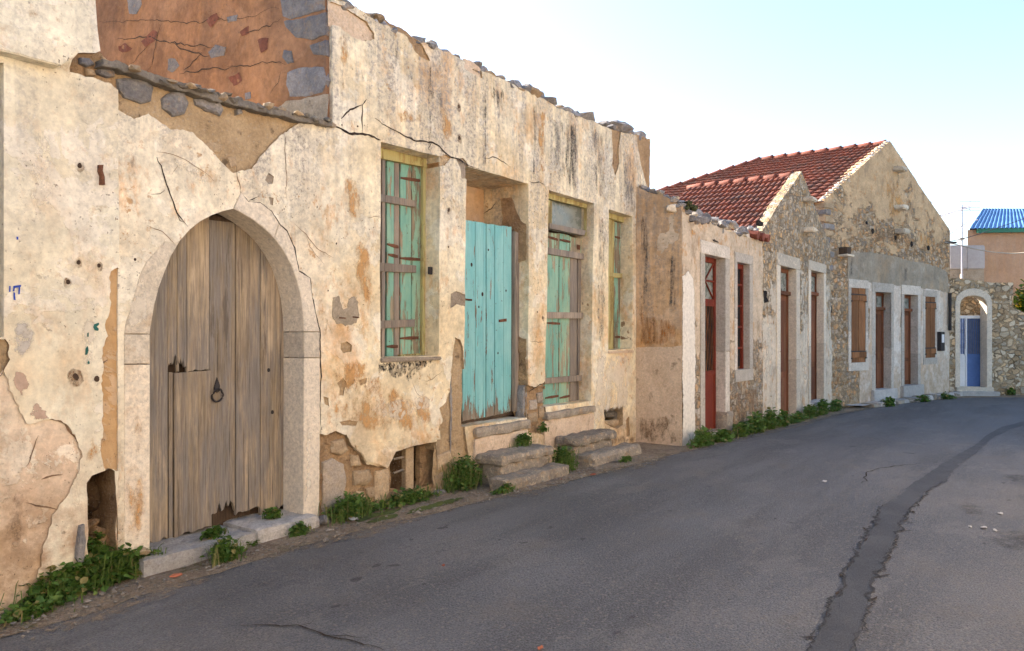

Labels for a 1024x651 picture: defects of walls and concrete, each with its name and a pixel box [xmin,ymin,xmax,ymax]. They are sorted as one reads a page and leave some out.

spalling [118,30,158,52]
spalling [240,26,269,53]
spalling [69,52,297,173]
crack [336,99,506,169]
crack [149,152,330,423]
spalling [450,291,465,308]
flaking render [0,262,117,614]
spalling [319,420,402,518]
spalling [416,339,467,492]